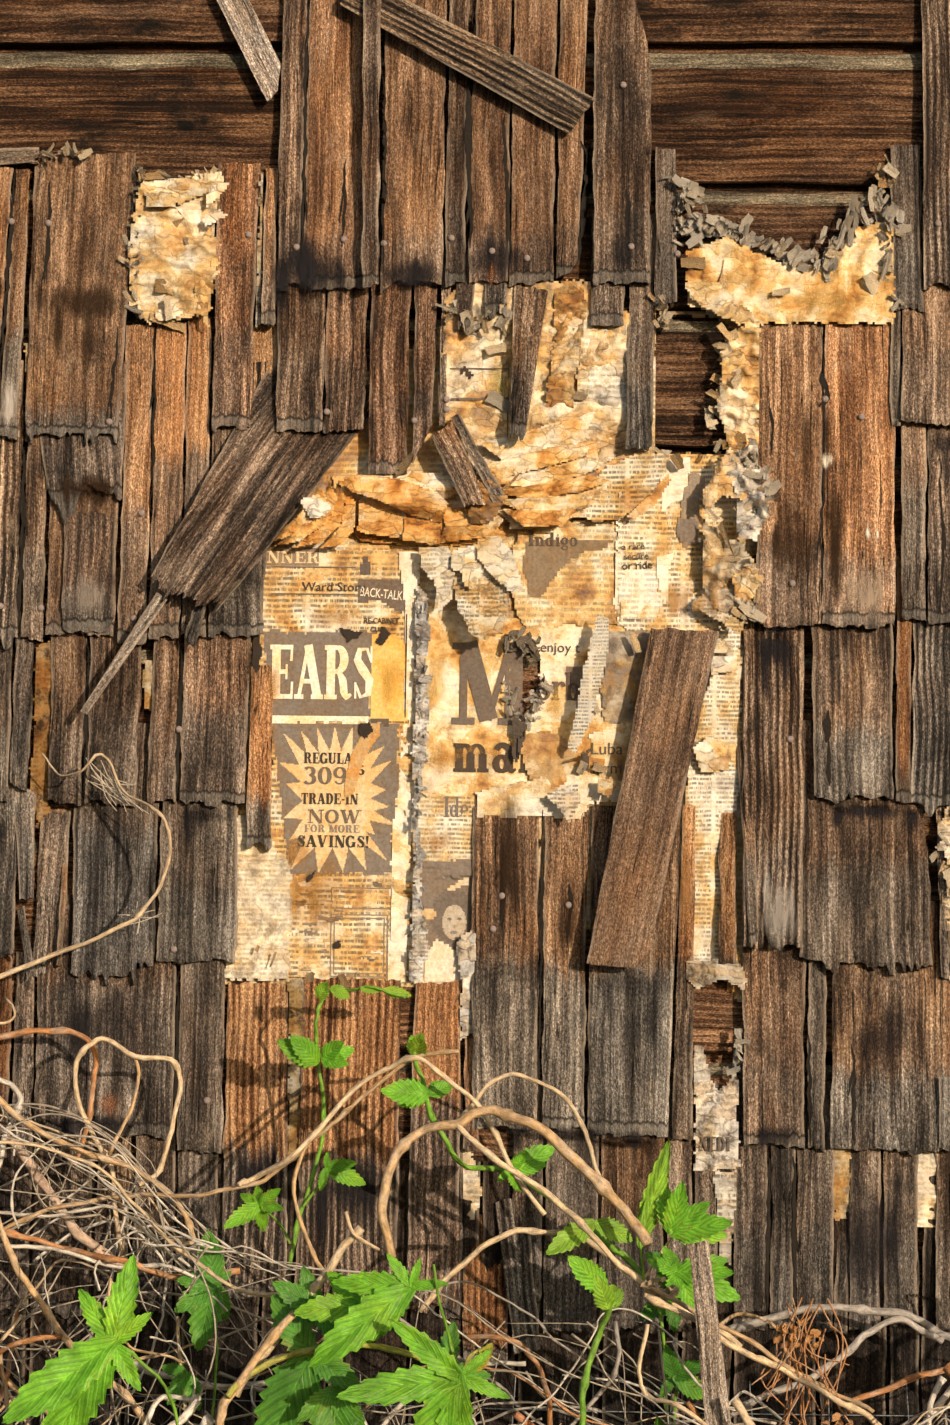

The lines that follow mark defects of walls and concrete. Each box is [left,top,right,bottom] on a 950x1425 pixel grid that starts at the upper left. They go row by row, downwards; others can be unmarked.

water stain [276,239,345,310]
water stain [381,242,435,287]